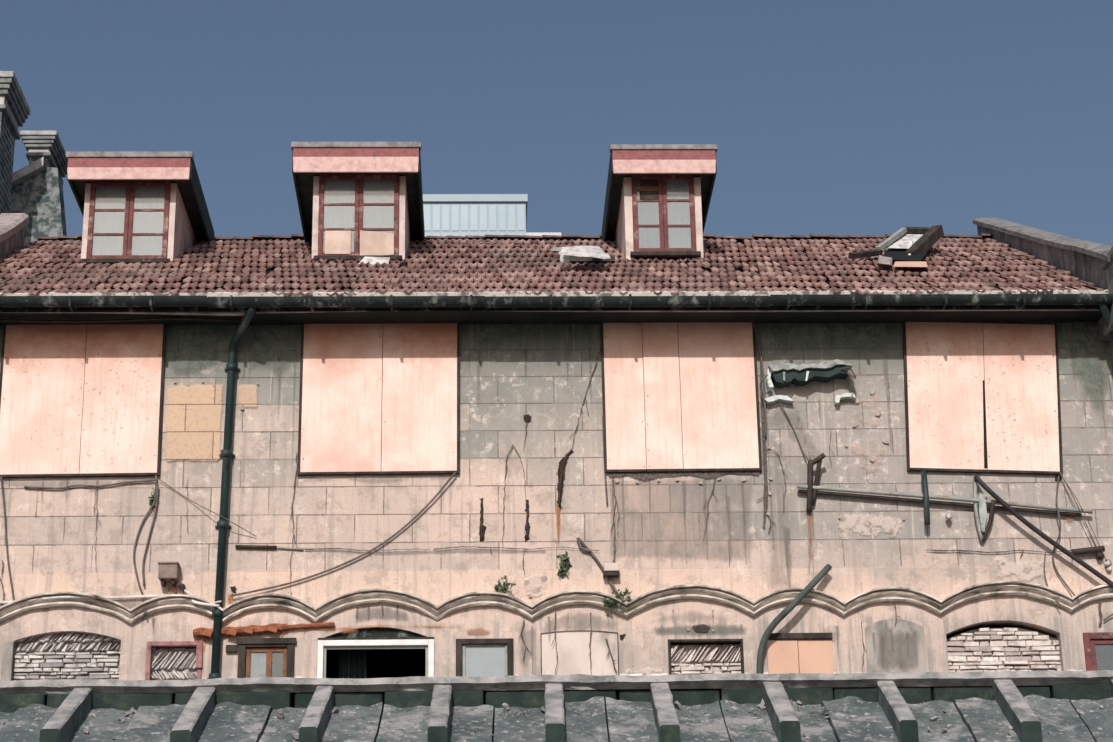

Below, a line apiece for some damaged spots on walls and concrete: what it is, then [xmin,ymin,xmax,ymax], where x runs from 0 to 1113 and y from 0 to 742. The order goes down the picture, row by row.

peeling [838,514,905,536]